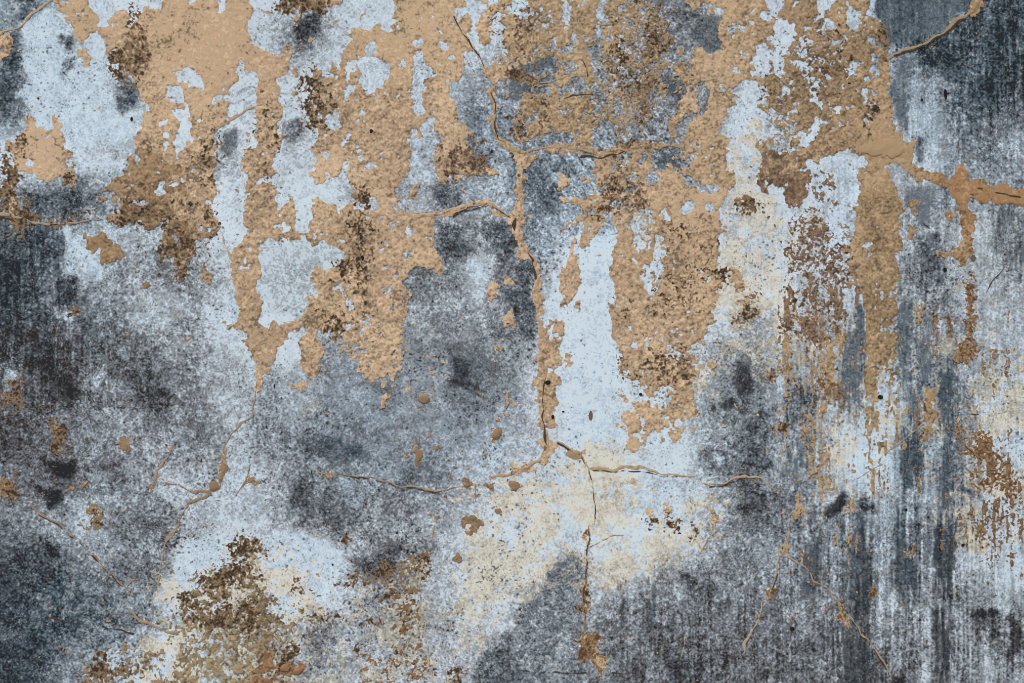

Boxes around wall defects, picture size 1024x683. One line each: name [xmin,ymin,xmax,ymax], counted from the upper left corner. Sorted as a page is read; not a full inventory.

crack [887,0,979,60]
peeling [63,228,103,282]
peeling [205,297,240,332]
crack [363,4,689,348]
crack [30,381,257,635]
crack [318,378,892,683]